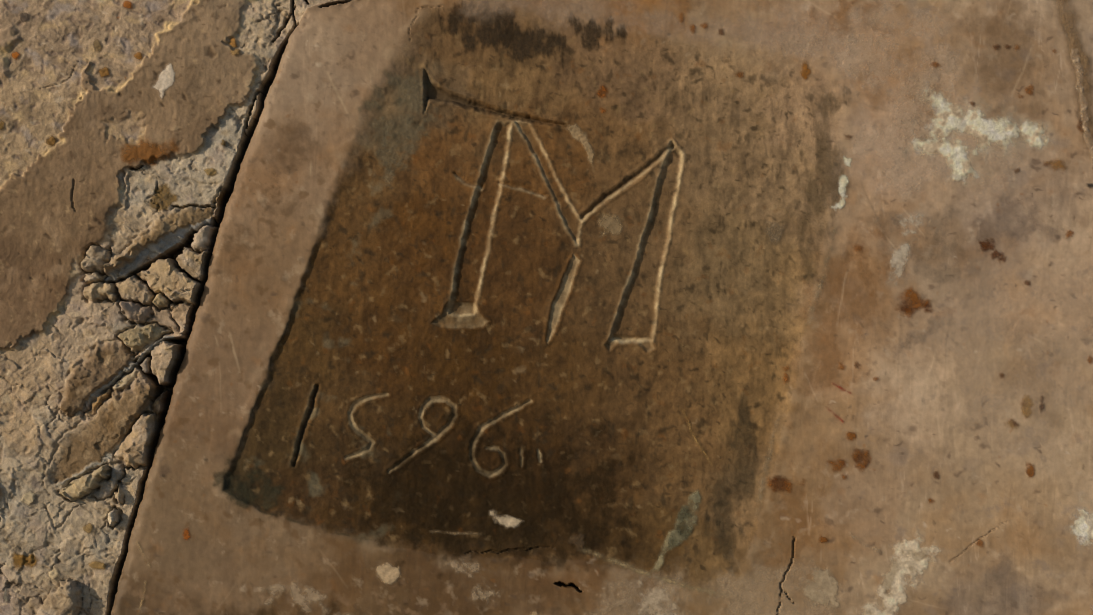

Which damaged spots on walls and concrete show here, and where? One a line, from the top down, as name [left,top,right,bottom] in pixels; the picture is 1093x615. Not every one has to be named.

water stain [439,1,626,67]
water stain [1057,0,1093,151]
water stain [913,93,1048,181]
crack [151,0,353,464]
spalling [0,0,350,615]
rust [900,289,929,316]
crack [42,502,90,531]
water stain [1072,510,1093,545]
crack [48,579,85,615]
crack [778,536,797,615]
water stain [862,535,939,615]